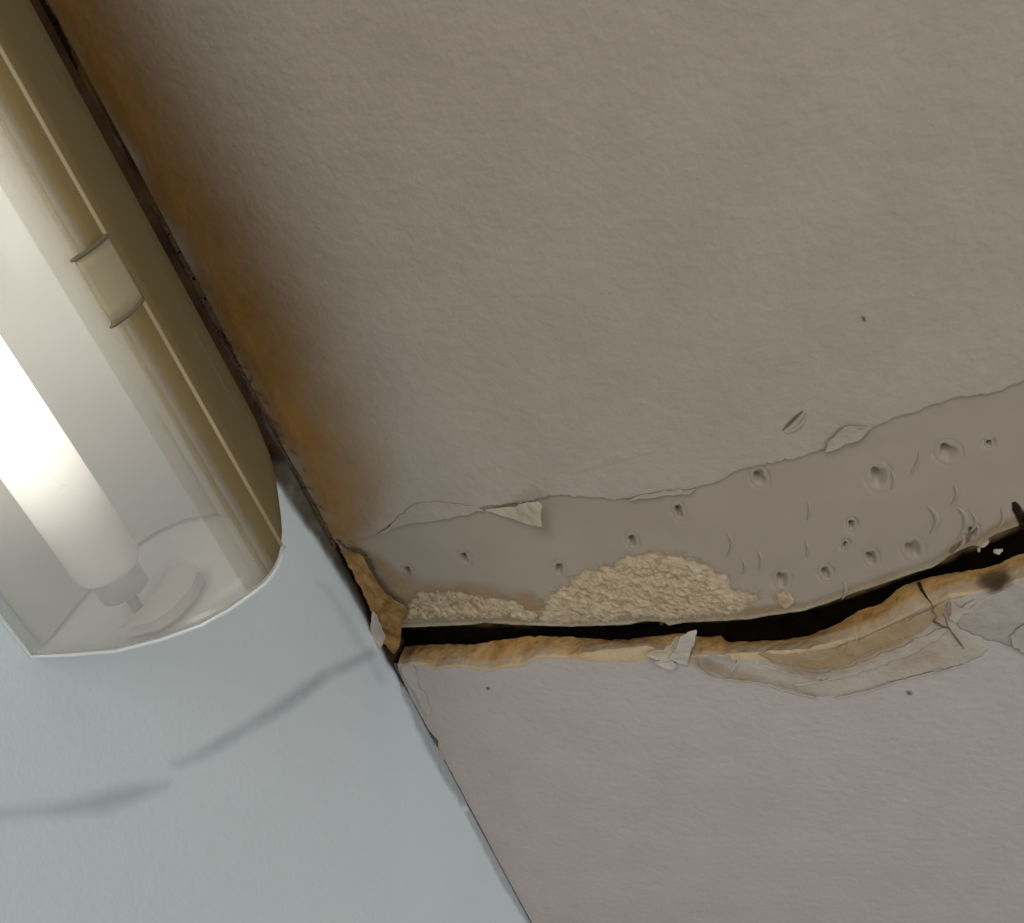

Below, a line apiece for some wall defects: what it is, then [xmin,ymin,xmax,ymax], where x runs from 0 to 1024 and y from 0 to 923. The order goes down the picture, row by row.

water stain [30,0,371,623]
crack [39,0,405,614]
water stain [382,633,405,684]
peeling [340,380,1024,699]
crack [393,501,1024,923]